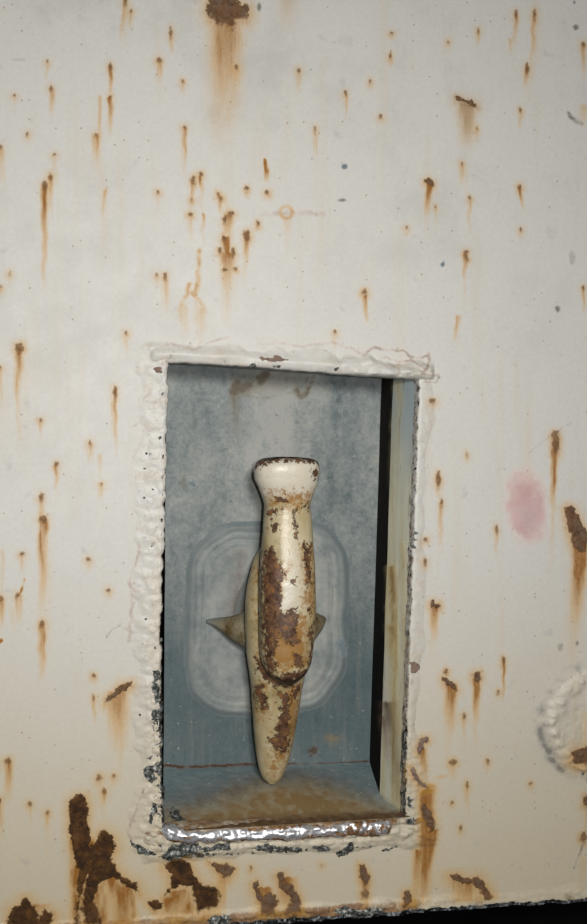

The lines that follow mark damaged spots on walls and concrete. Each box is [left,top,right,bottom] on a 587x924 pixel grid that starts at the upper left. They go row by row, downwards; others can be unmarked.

rust [206,0,249,62]
rust [565,505,587,595]
rust [442,669,457,709]
rust [571,746,587,764]
rust [173,786,410,831]
rust [411,767,437,884]
rust [7,898,53,924]
rust [68,794,138,924]
rust [148,858,221,914]
rust [211,862,235,879]
rust [253,872,301,915]
rust [450,873,492,900]